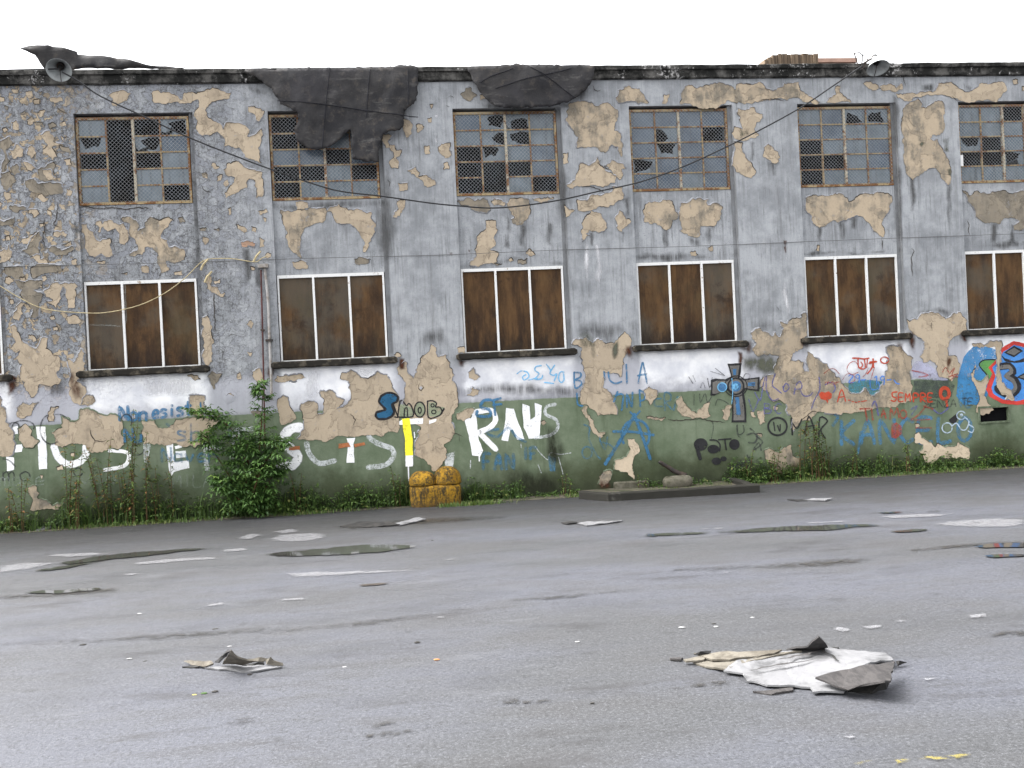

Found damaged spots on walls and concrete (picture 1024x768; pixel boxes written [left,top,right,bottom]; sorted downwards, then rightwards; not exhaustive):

peeling [151,87,376,269]
spalling [457,81,851,268]
spalling [804,191,893,237]
spalling [863,79,1024,185]
spalling [963,189,1024,231]
peeling [0,89,187,470]
peeling [236,344,480,472]
peeling [571,331,632,438]
spalling [750,311,1015,474]